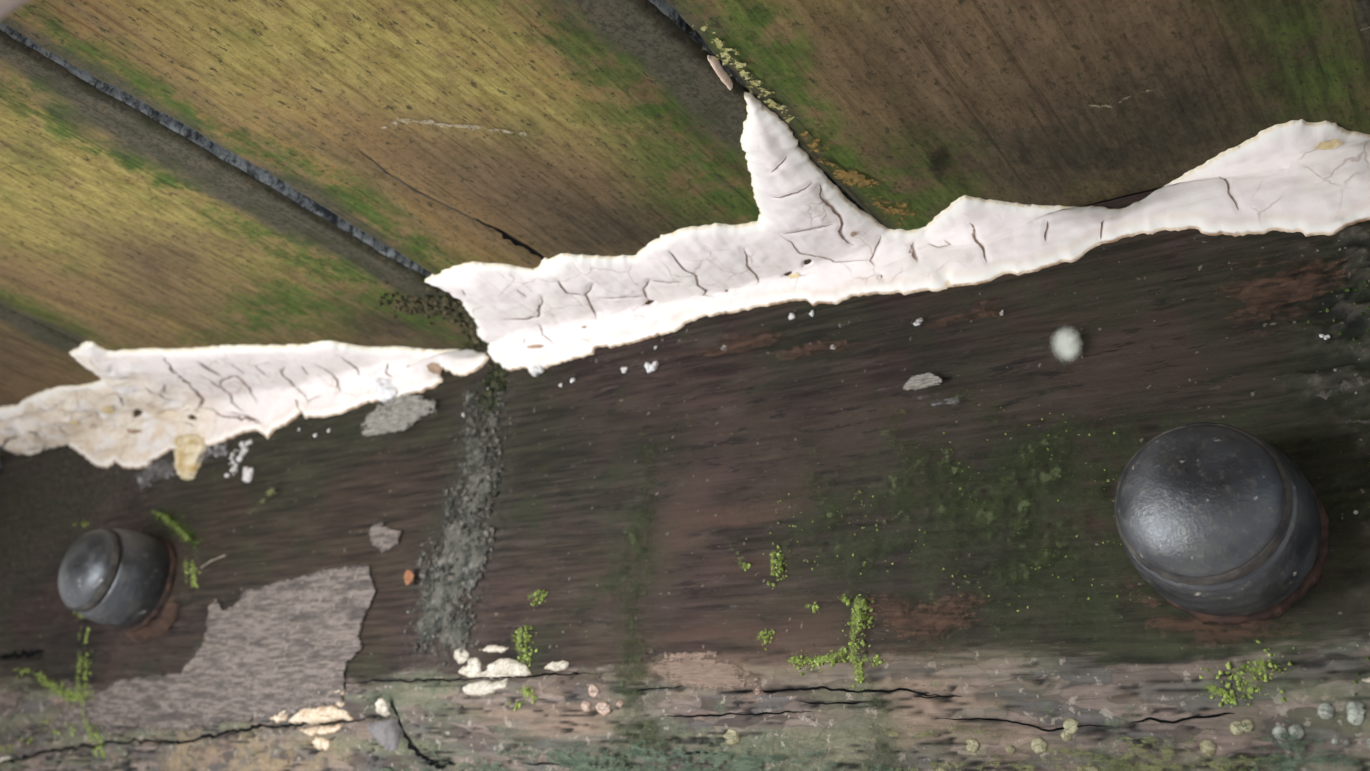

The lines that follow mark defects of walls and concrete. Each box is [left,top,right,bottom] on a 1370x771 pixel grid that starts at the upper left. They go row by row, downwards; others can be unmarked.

crack [355,147,714,345]
crack [744,250,759,285]
crack [771,156,987,264]
spalling [1316,376,1370,400]
peeling [369,522,401,553]
leakage [403,381,512,670]
peeling [45,564,375,737]
crack [0,672,1096,769]
crack [1131,713,1235,724]